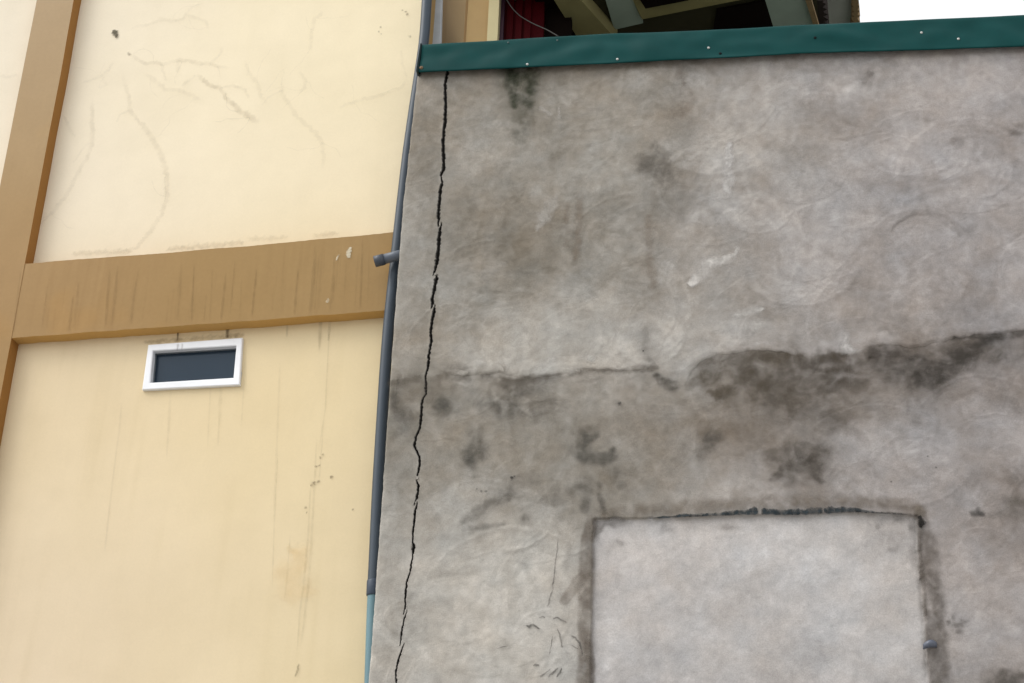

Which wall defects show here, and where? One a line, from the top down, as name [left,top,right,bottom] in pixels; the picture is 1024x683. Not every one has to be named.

crack [395,71,449,683]